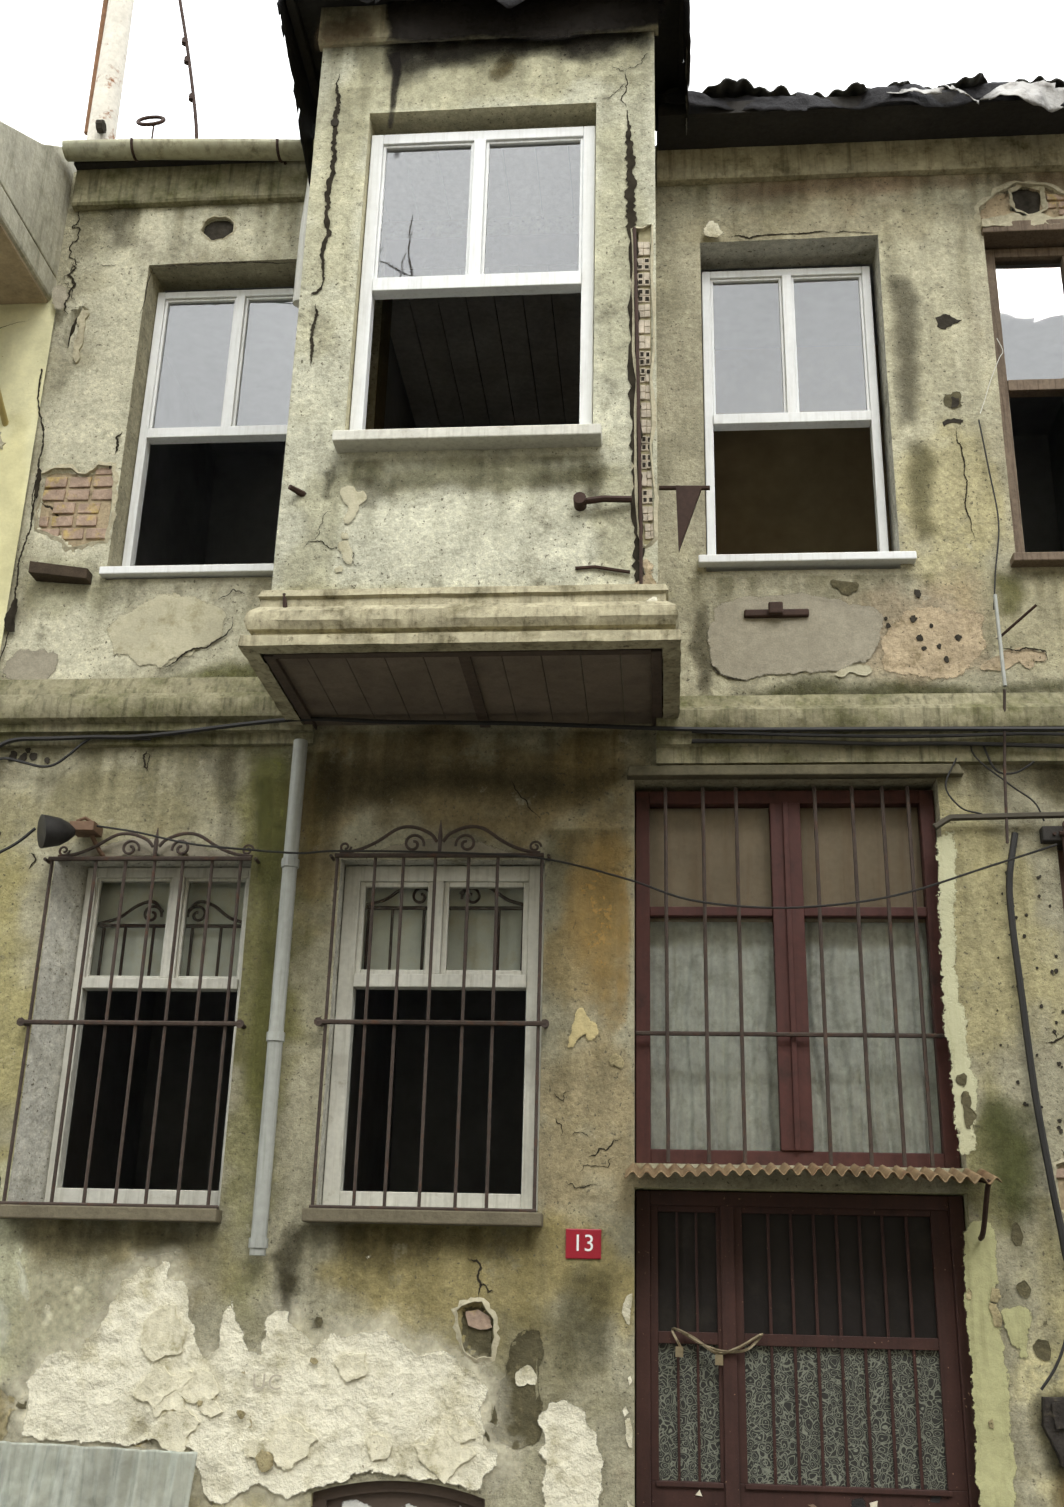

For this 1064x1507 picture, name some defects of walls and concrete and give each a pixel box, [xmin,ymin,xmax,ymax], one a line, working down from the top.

flaking render [974,180,1064,229]
crack [603,53,647,582]
crack [0,74,341,668]
flaking render [31,460,119,552]
flaking render [830,579,859,595]
flaking render [835,589,1048,680]
peeling [935,831,979,1155]
water stain [276,1232,299,1311]
peeling [622,1294,633,1325]
flaking render [0,1256,604,1507]
peeling [622,1406,633,1448]
peeling [963,1220,1051,1507]